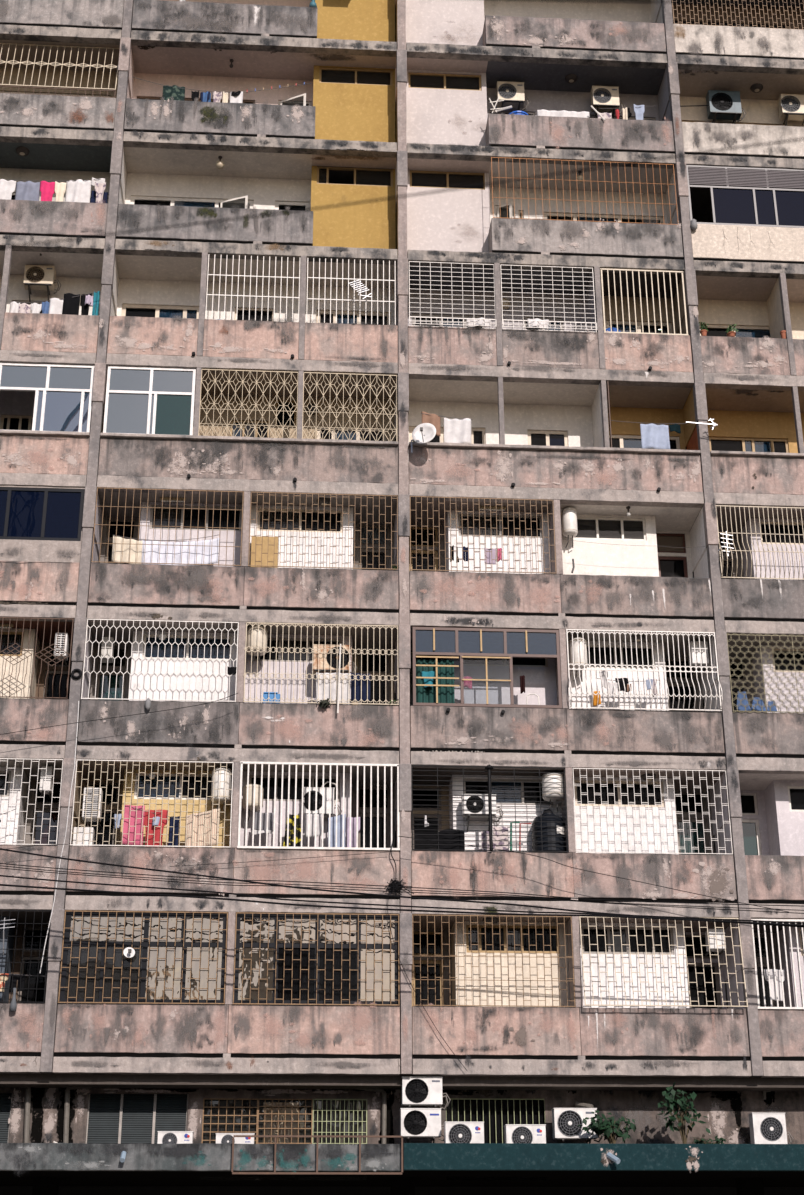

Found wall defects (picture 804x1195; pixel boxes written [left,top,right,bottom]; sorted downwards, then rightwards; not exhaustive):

leakage [675,26,727,76]
leakage [126,98,228,141]
leakage [567,119,603,142]
leakage [125,567,219,618]
leakage [307,570,345,599]
leakage [503,580,520,606]
leakage [593,579,711,628]
leakage [470,857,504,892]
leakage [603,856,659,890]
leakage [151,1014,219,1066]
leakage [234,1015,250,1038]
spalling [8,1088,201,1152]